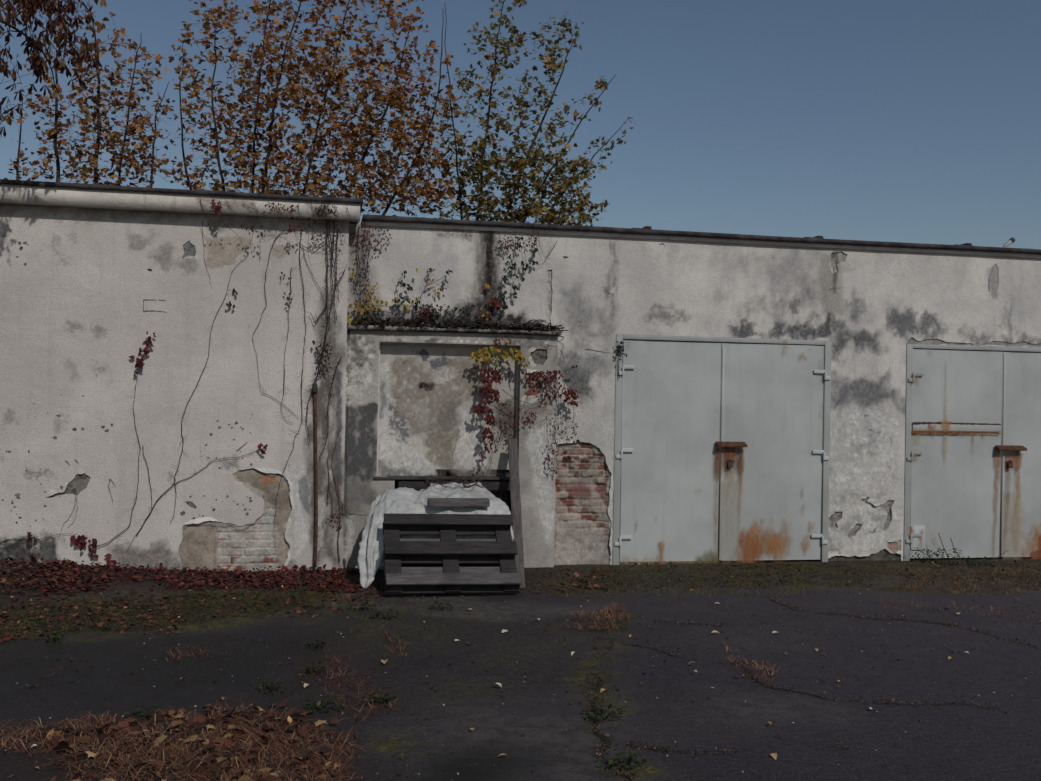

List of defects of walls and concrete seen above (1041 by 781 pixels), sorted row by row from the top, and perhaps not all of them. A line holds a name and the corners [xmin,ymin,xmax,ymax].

leakage [348,223,539,334]
leakage [733,324,753,337]
leakage [771,255,878,354]
leakage [888,311,941,337]
leakage [831,377,895,409]
flaking render [2,469,91,527]
flaking render [178,414,309,571]
leakage [307,296,378,566]
flaking render [345,334,614,565]
corrosion [716,447,743,486]
corrosion [912,421,1001,452]
corrosion [740,525,788,563]